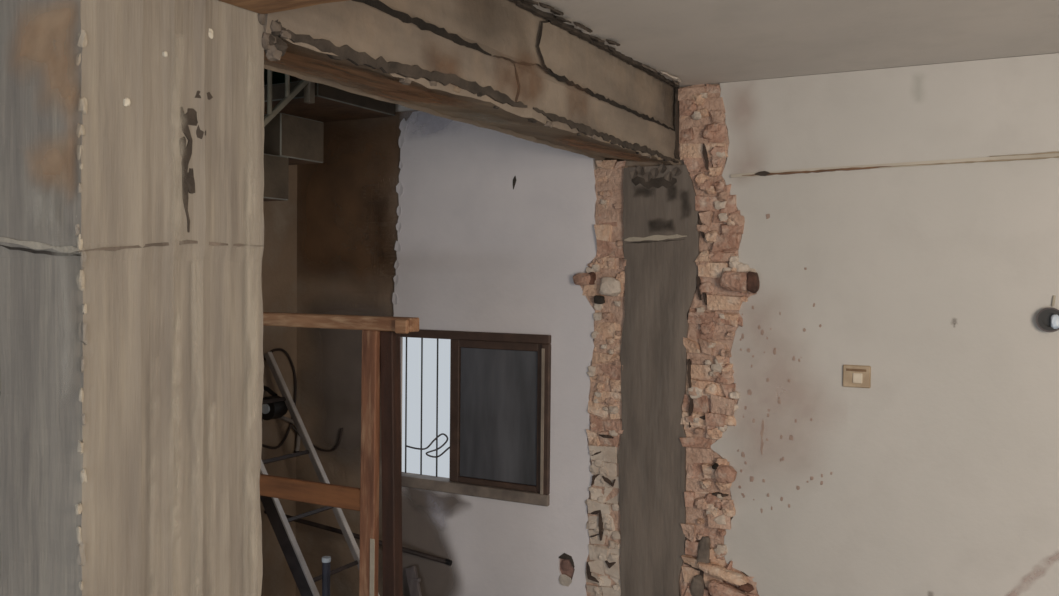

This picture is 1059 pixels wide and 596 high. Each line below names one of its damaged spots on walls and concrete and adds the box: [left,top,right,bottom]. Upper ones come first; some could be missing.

crack [352,0,680,159]
spalling [74,216,88,373]
flaking render [258,0,790,596]